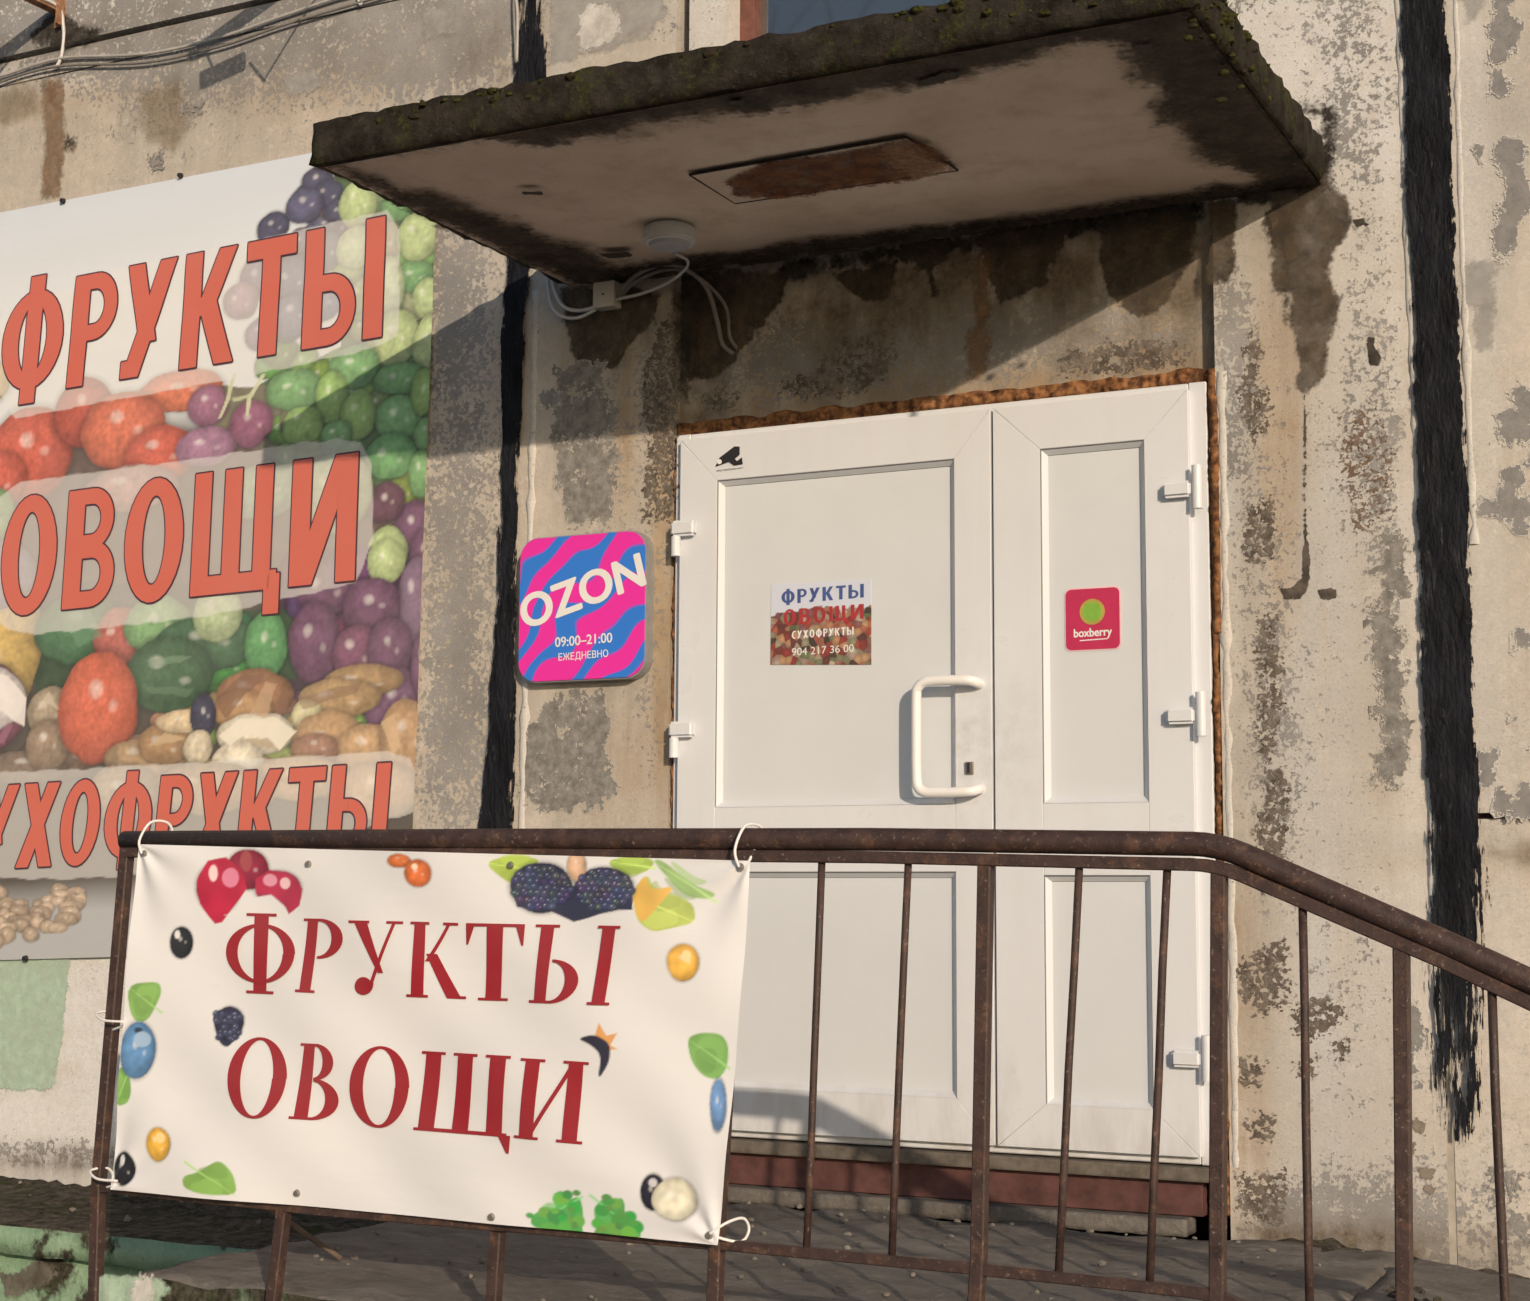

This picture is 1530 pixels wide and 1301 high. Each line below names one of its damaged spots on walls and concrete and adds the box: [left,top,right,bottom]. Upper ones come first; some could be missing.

peeling [1484,0,1528,102]
damp [319,11,1352,414]
rust [724,139,954,199]
peeling [1470,134,1530,265]
peeling [1475,378,1530,538]
peeling [1508,623,1530,656]
peeling [1476,744,1530,823]